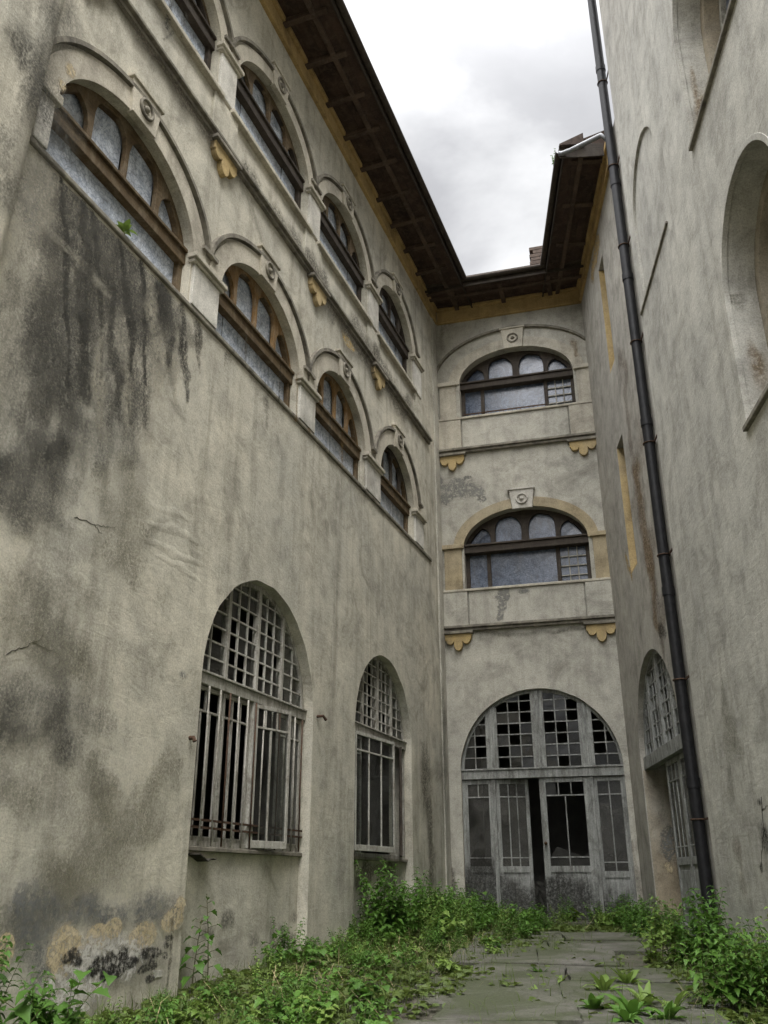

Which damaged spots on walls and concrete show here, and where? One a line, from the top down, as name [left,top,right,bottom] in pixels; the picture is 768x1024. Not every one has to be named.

damp [0,0,424,532]
peeling [440,476,486,505]
damp [0,678,76,762]
damp [5,771,177,989]
peeling [0,932,15,971]
spalling [44,897,186,1017]